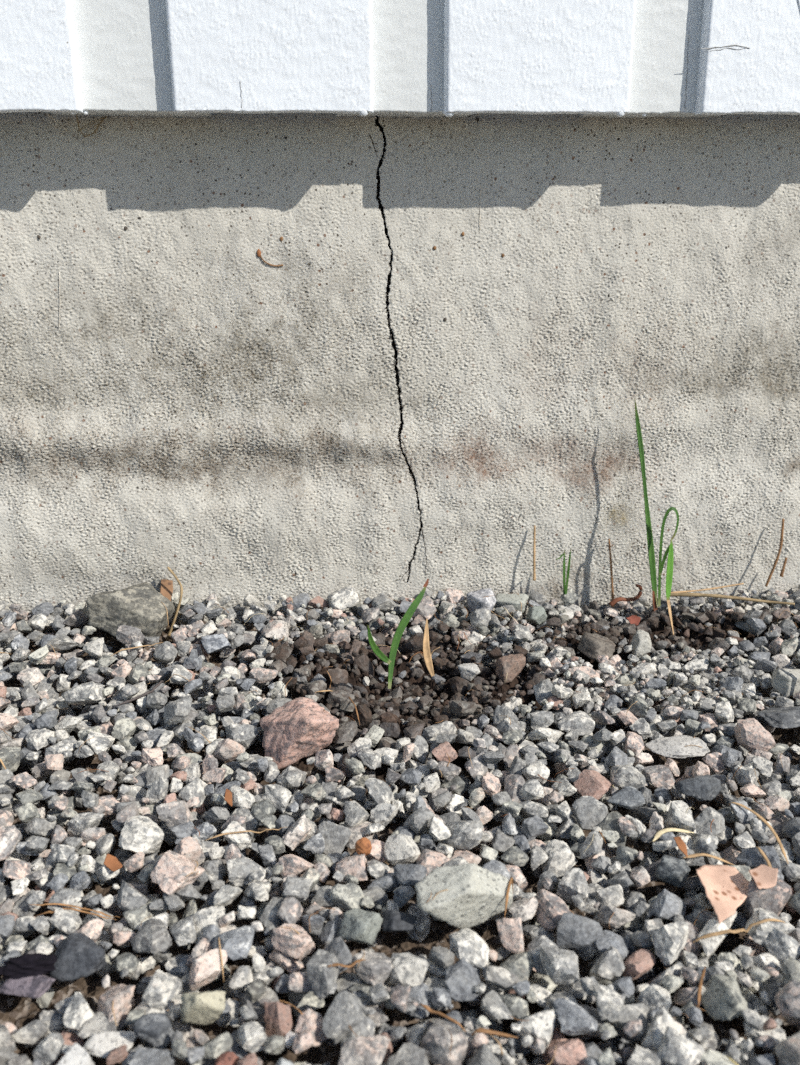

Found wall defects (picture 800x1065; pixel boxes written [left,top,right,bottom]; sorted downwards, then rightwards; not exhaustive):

crack [369,116,427,583]